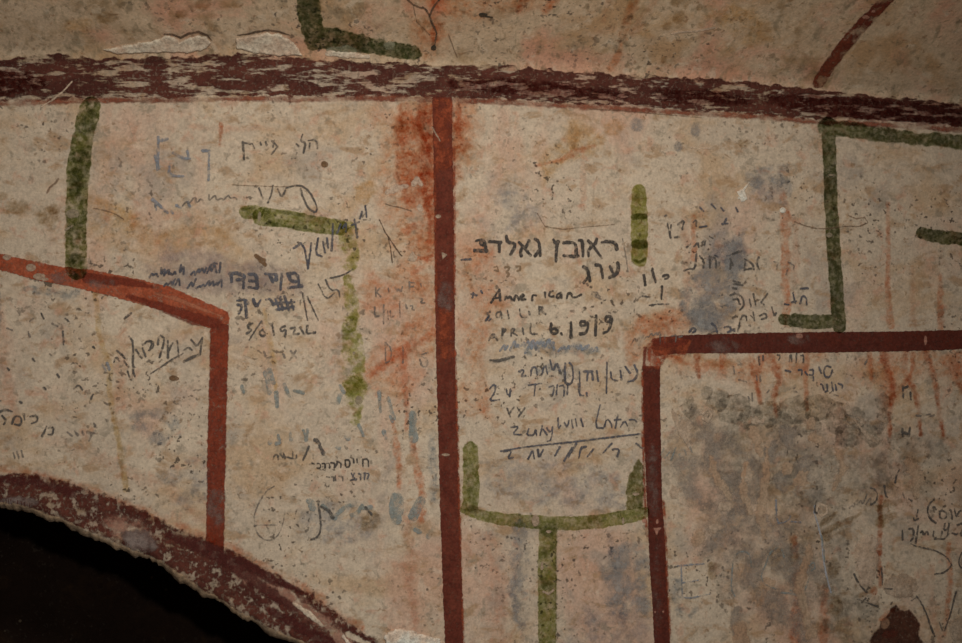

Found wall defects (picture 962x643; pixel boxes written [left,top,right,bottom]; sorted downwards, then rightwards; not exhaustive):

peeling [293,602,324,627]
peeling [384,629,440,643]